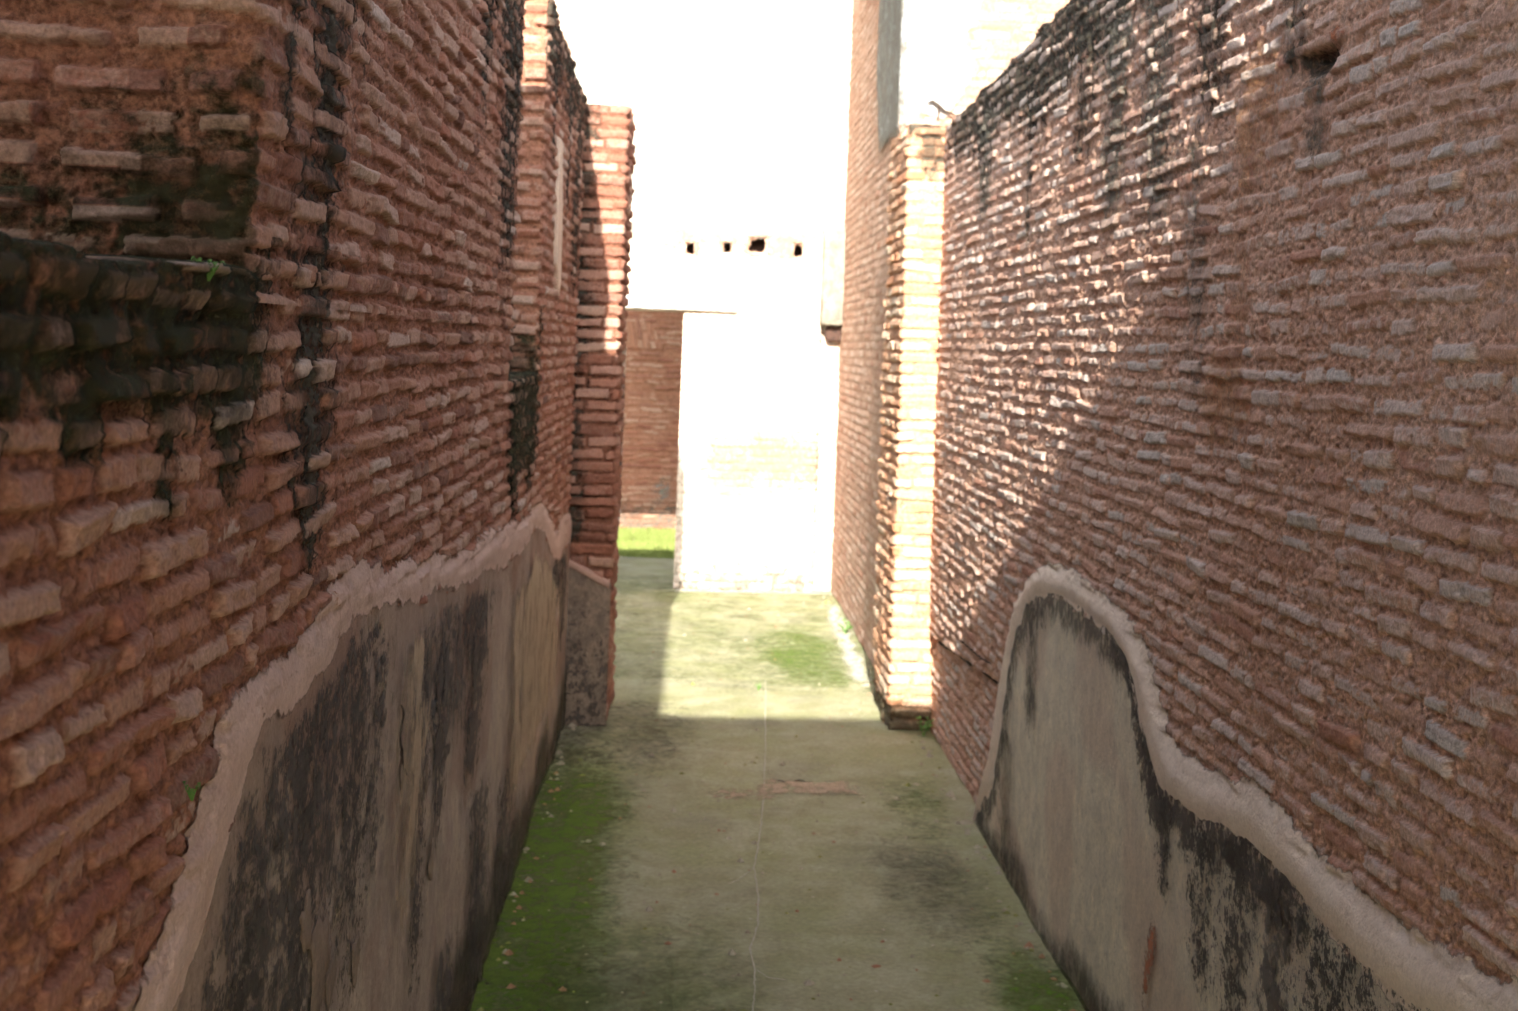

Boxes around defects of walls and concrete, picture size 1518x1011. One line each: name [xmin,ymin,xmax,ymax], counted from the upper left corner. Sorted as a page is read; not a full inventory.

leakage [0,0,369,569]
flaking render [571,0,843,296]
leakage [876,0,1230,384]
leakage [201,623,390,1011]
leakage [407,582,586,1011]
leakage [975,593,1434,1011]